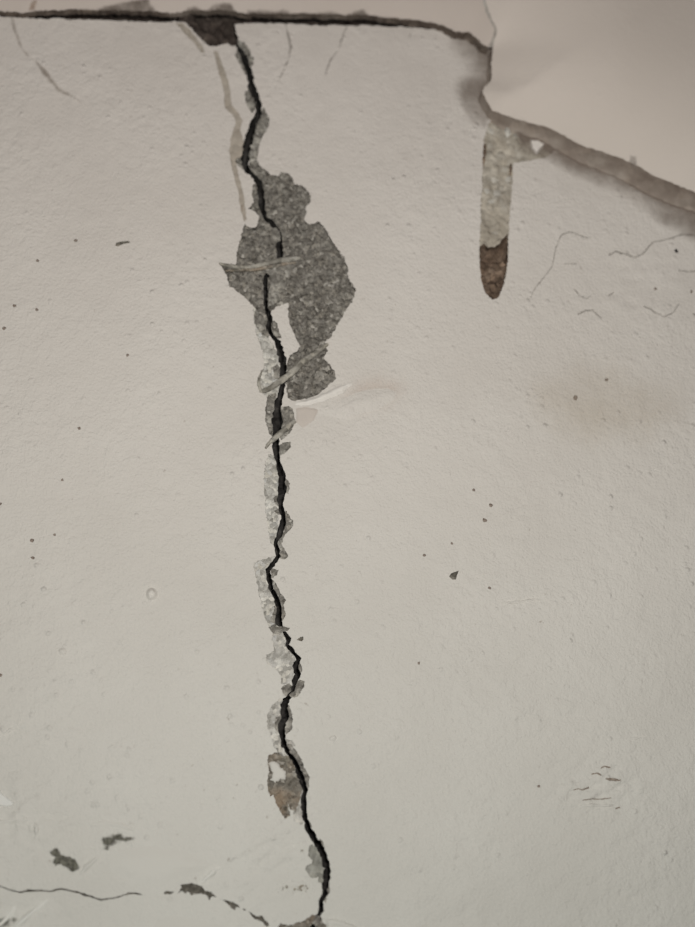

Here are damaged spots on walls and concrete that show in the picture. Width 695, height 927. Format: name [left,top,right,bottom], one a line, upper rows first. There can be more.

peeling [530,140,544,154]
spalling [219,162,356,401]
spalling [479,234,508,300]
crack [0,14,417,927]
spalling [305,844,324,884]